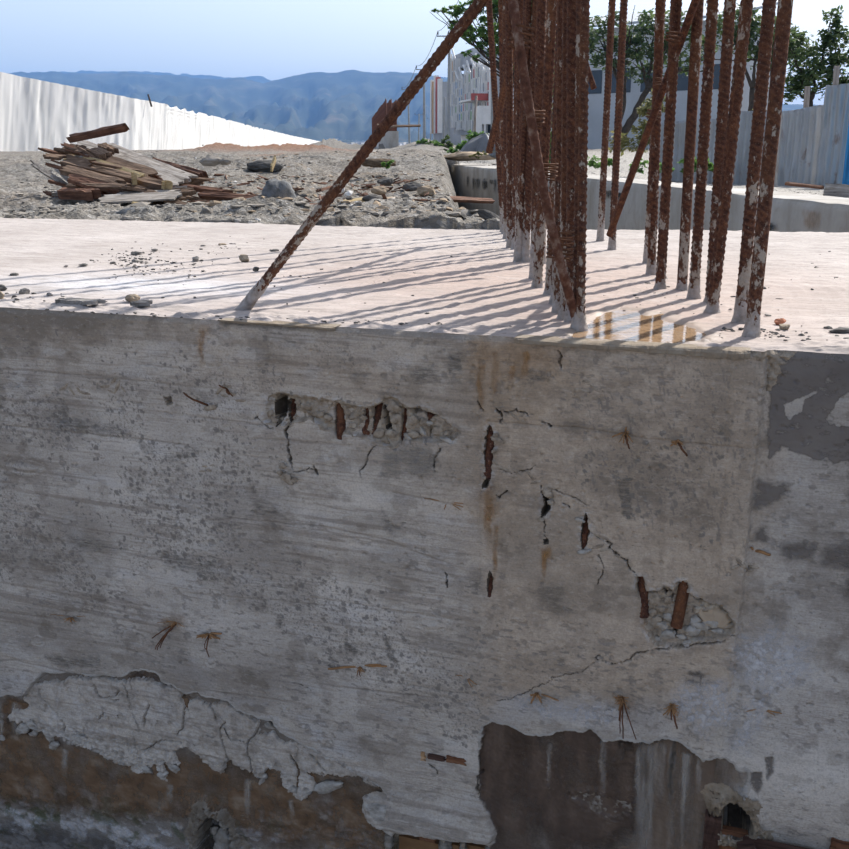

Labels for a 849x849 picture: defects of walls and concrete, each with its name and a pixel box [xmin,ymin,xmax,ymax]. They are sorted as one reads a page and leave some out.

spalling [751,350,801,391]
spalling [265,392,462,449]
spalling [635,574,737,649]
peeling [7,675,379,801]
damp [0,698,393,849]
damp [478,722,738,849]
peeling [477,718,752,801]